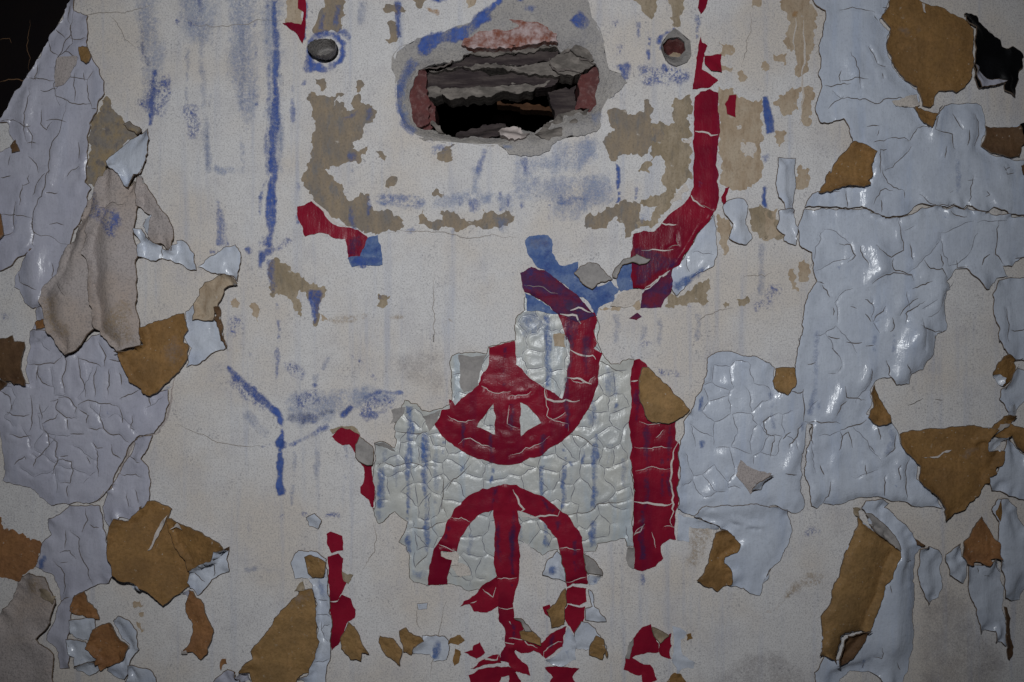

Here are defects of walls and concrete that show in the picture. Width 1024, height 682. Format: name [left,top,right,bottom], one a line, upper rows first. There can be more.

peeling [0,0,260,682]
spalling [301,78,404,235]
peeling [373,0,1024,682]